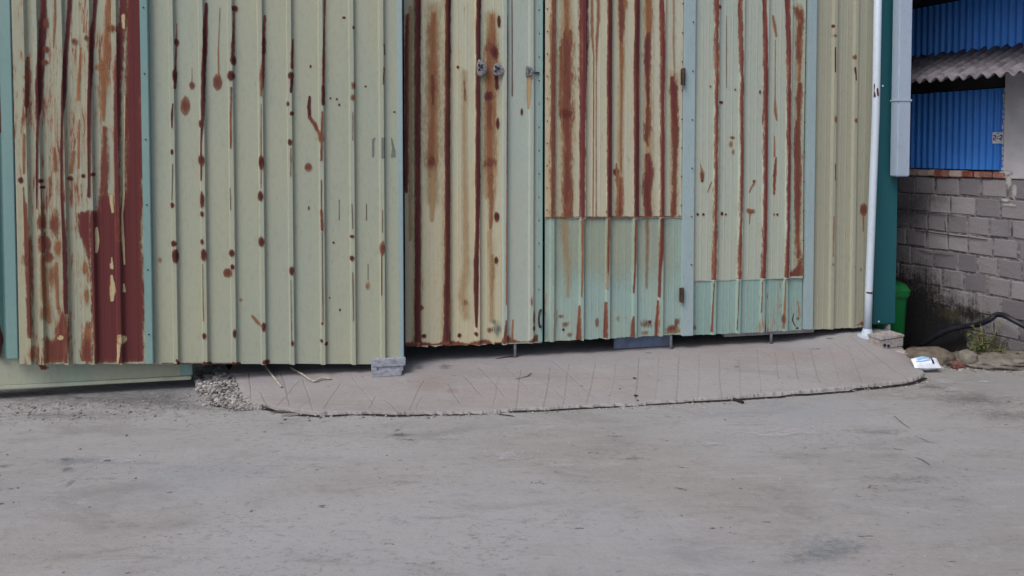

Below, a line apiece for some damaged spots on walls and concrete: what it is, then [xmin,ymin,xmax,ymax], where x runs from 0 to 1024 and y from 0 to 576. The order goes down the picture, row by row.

rust [18,0,145,370]
rust [159,241,179,263]
rust [171,3,238,217]
rust [223,250,234,277]
rust [286,39,294,116]
rust [308,180,335,325]
rust [305,0,367,171]
rust [339,210,385,321]
rust [393,0,538,347]
rust [545,0,682,340]
rust [696,0,804,332]